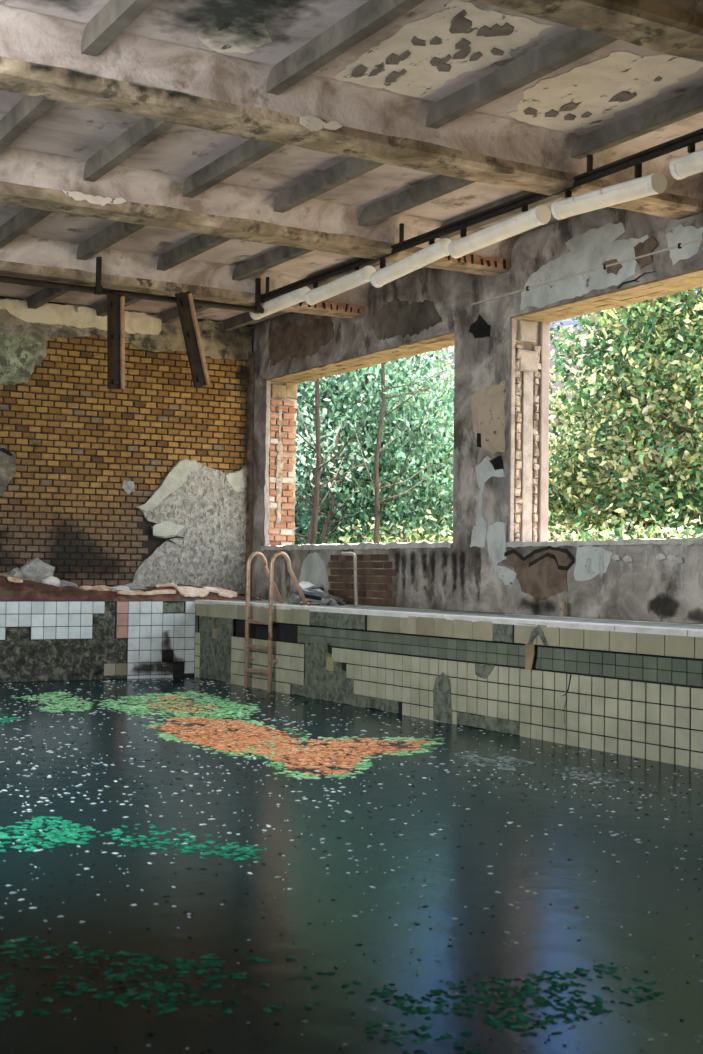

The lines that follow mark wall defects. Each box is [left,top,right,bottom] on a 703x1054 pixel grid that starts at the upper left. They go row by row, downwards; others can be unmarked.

peeling [334,0,555,97]
peeling [507,51,703,132]
peeling [521,222,703,310]
spalling [0,332,248,683]
spalling [470,344,633,600]